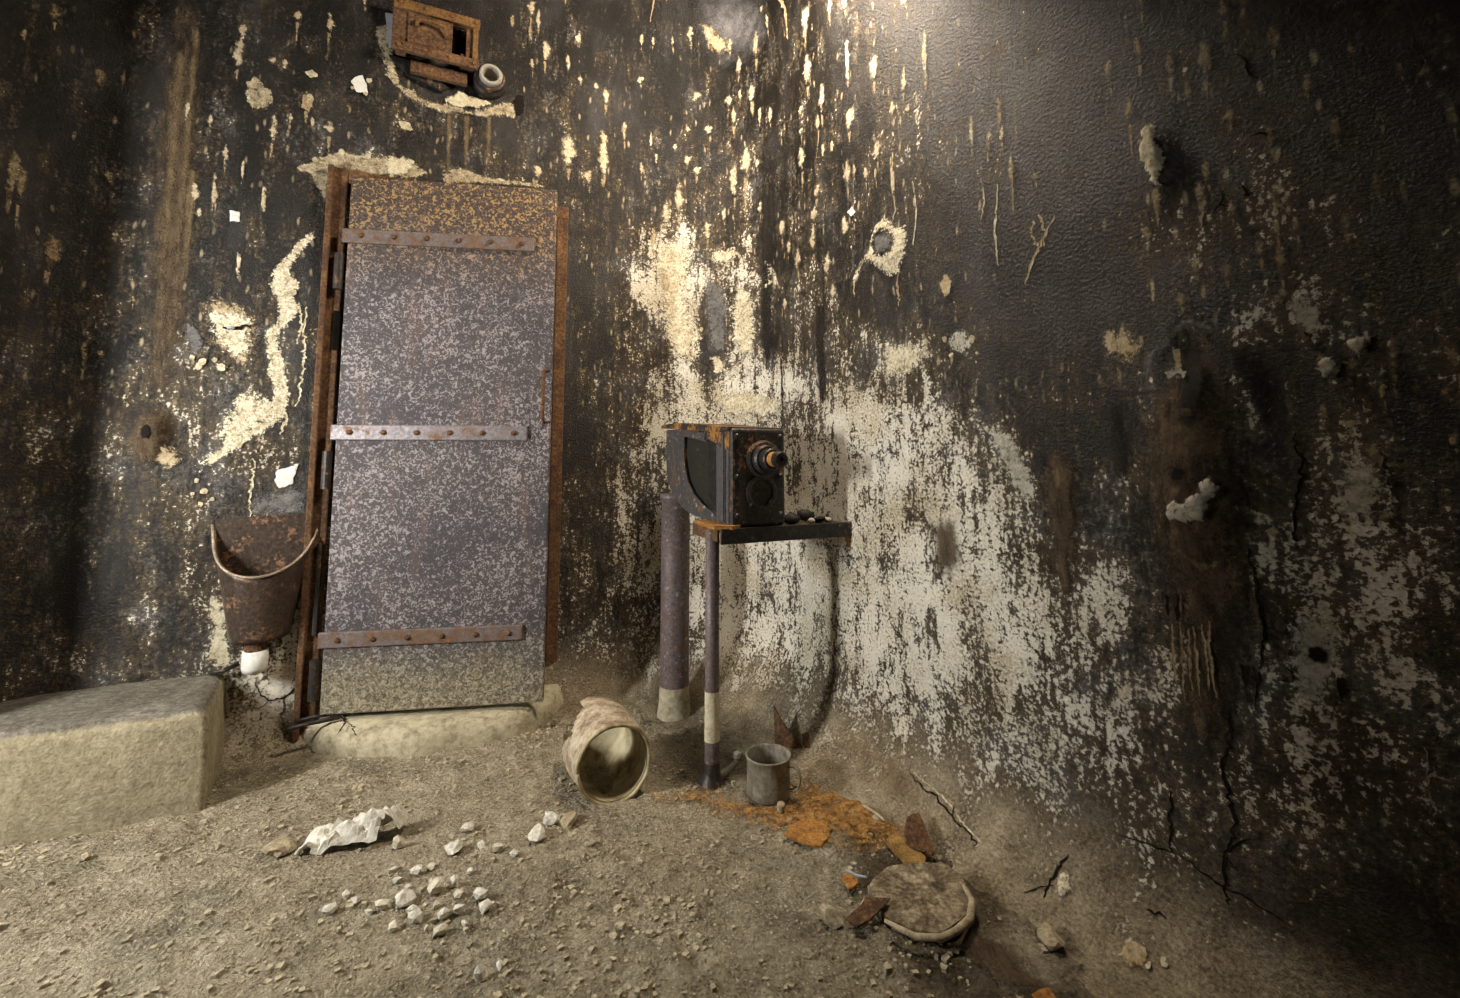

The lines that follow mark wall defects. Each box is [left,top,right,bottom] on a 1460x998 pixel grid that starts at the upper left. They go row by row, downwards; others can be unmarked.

water stain [1165,43,1210,106]
peeling [186,231,315,517]
peeling [653,237,778,374]
spalling [853,218,908,306]
peeling [879,329,975,379]
spalling [939,275,952,296]
water stain [969,97,1017,265]
water stain [1195,162,1211,228]
water stain [1255,188,1300,295]
peeling [984,425,1037,511]
crack [1292,433,1308,541]
crack [1118,549,1283,921]